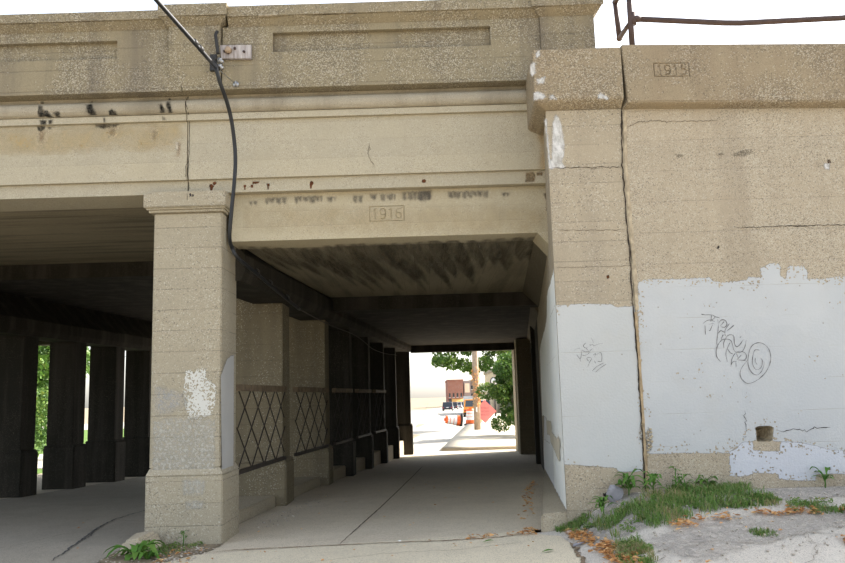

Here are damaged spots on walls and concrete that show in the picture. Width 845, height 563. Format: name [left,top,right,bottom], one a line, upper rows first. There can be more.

damp [37,103,60,131]
damp [87,102,119,135]
crack [554,111,717,490]
peeling [152,355,234,470]
peeling [540,263,845,508]
crack [53,510,145,560]